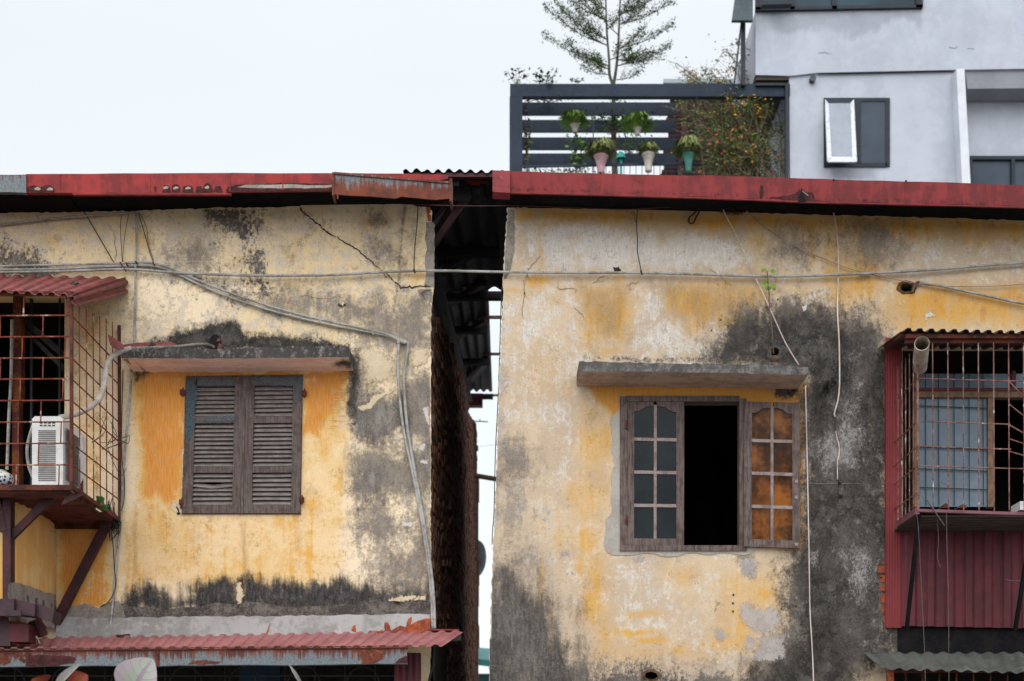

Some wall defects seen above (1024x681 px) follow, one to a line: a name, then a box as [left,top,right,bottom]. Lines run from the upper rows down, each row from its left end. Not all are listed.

rust [27,185,55,193]
rust [154,182,332,193]
damp [167,208,431,344]
crack [300,207,432,300]
peeling [358,347,397,411]
damp [150,320,430,538]
damp [490,297,897,681]
damp [126,539,430,610]
rust [0,652,75,667]
rust [361,649,385,664]
peeling [740,602,785,661]